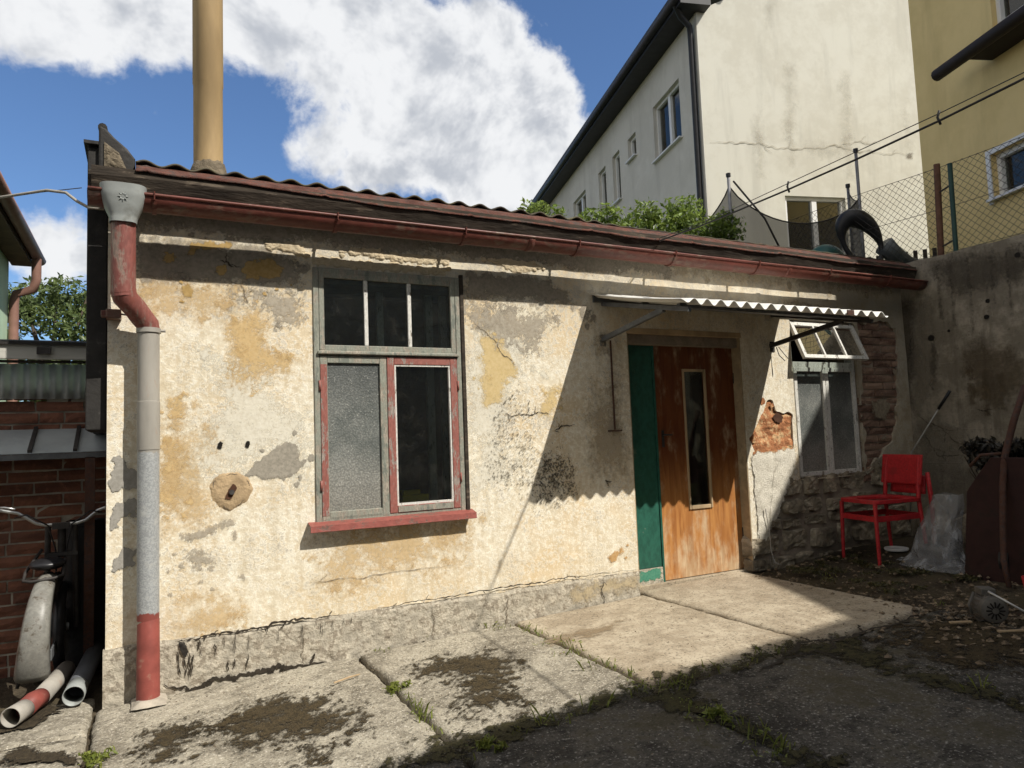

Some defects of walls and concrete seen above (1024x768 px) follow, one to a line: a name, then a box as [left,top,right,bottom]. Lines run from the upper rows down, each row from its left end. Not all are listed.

crack [710,136,907,155]
peeling [136,236,452,397]
peeling [464,297,562,408]
peeling [245,430,315,487]
leakage [466,326,583,512]
crack [507,400,575,432]
peeling [541,386,563,415]
spalling [749,398,793,469]
peeling [159,391,247,638]
crack [164,611,339,692]